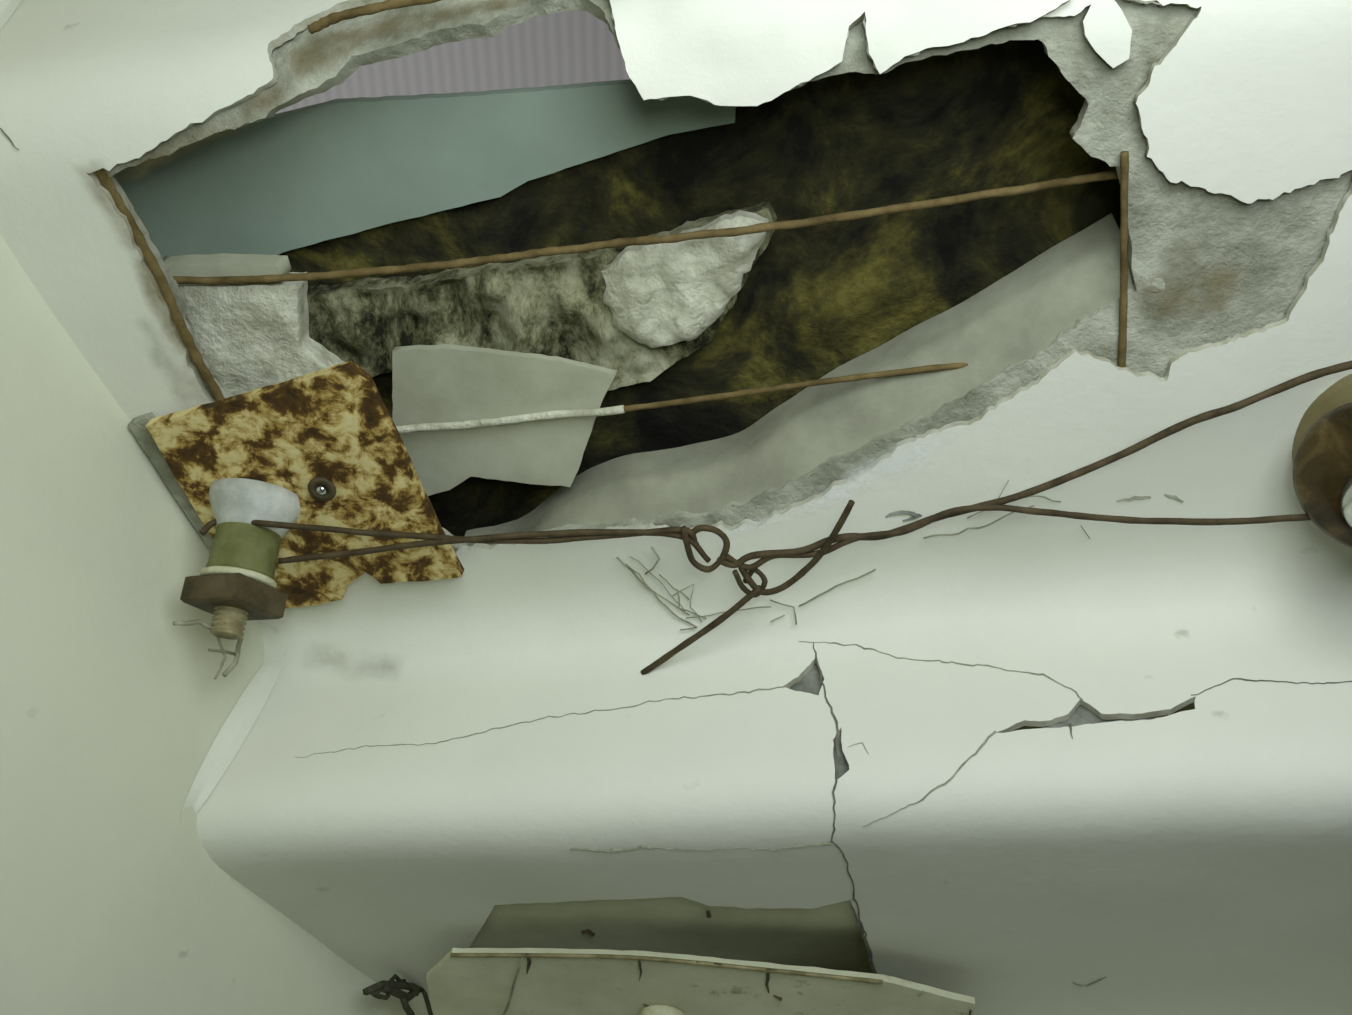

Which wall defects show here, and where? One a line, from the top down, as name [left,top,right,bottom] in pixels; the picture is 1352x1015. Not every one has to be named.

spalling [93,0,621,399]
spalling [442,0,1352,553]
crack [301,641,1352,974]